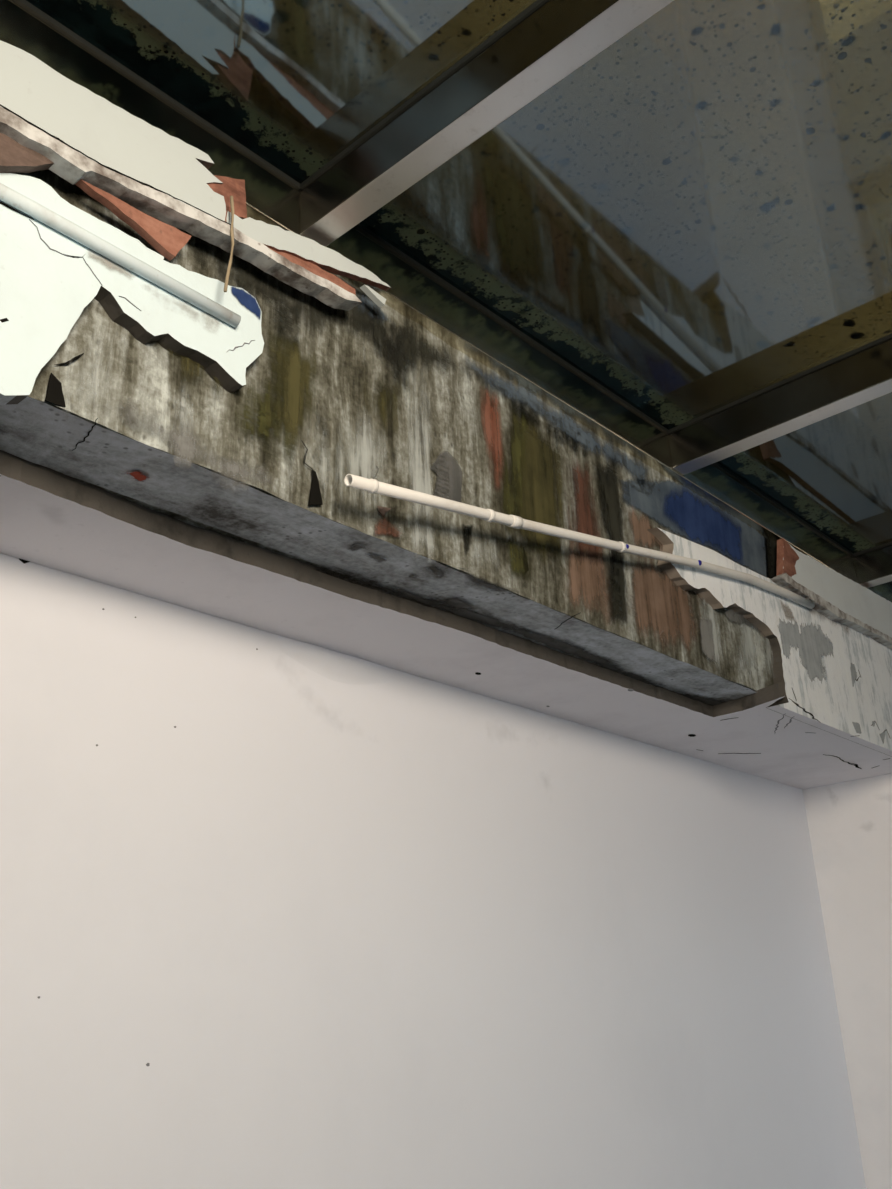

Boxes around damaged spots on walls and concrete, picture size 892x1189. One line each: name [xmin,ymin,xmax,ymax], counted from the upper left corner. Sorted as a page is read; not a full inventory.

crack [0,202,141,311]
peeling [231,287,261,319]
damp [219,259,451,385]
spalling [45,373,66,407]
spalling [309,470,323,505]
damp [321,428,375,480]
damp [410,421,462,513]
peeling [468,360,769,577]
damp [503,401,771,670]
damp [764,536,777,579]
damp [316,566,724,706]
peeling [779,619,834,683]